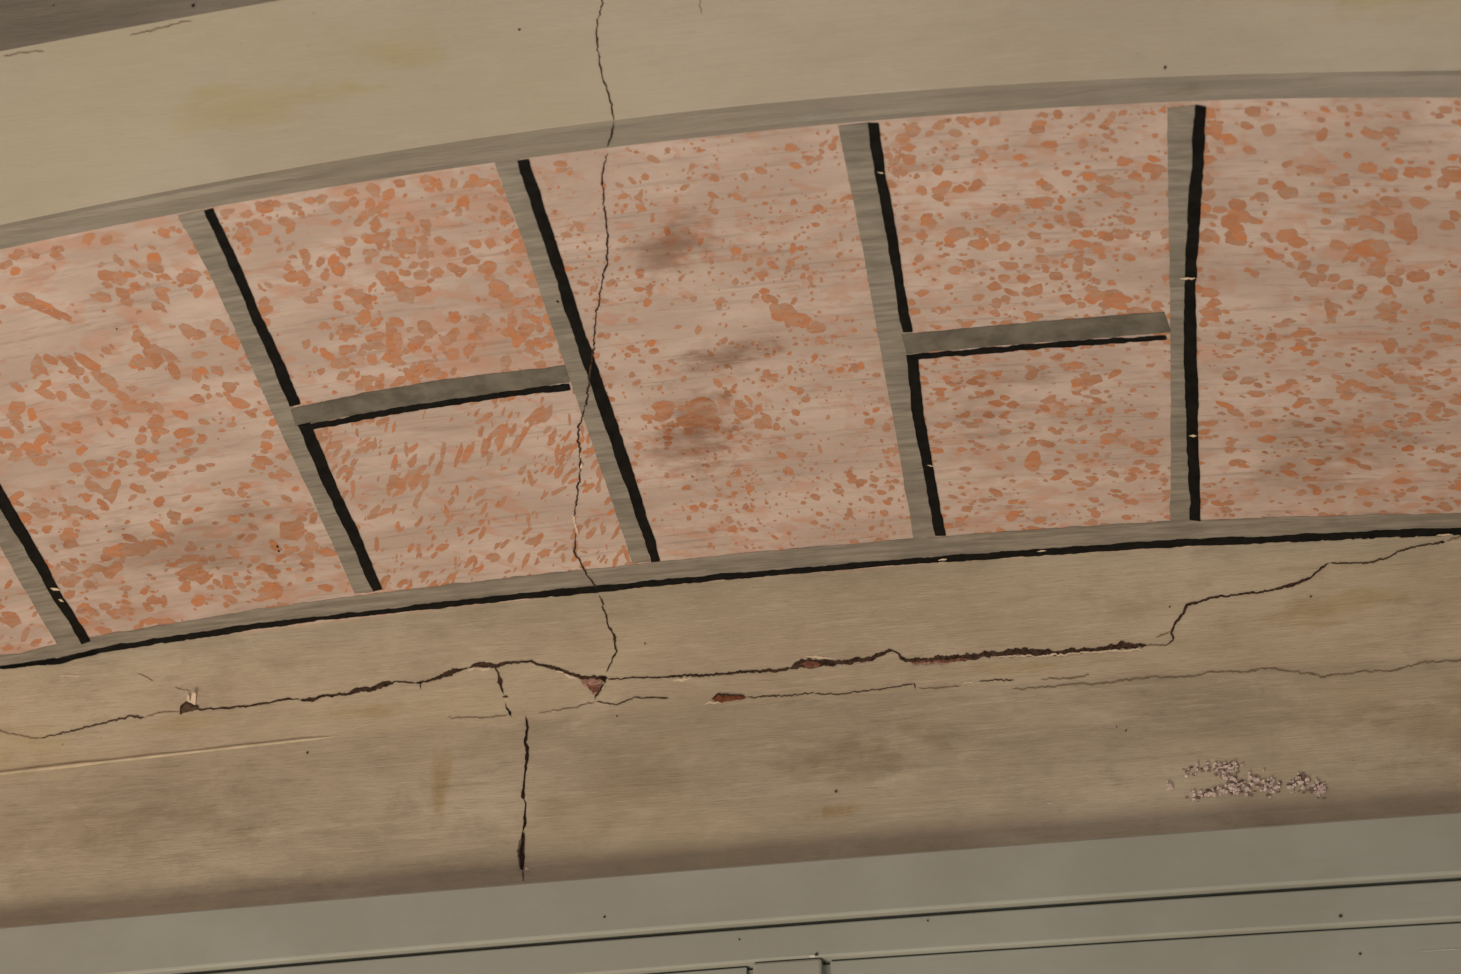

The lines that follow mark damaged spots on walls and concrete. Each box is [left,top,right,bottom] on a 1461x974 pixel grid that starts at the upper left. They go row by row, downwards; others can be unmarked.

crack [130,21,191,36]
crack [197,0,1461,881]
crack [0,711,179,739]
peeling [1166,760,1327,802]